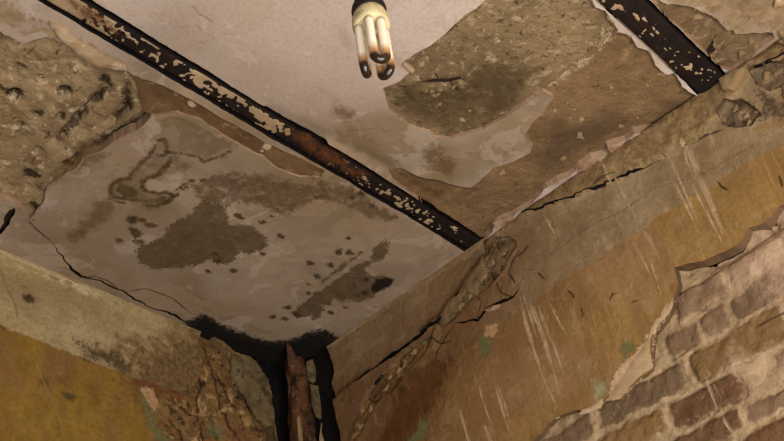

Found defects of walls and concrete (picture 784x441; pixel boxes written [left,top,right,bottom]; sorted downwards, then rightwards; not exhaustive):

crack [706,35,716,56]
leakage [78,138,228,234]
corrosion [285,129,365,177]
flaking render [0,0,784,274]
crack [574,170,639,198]
crack [0,208,49,240]
leakage [126,215,157,246]
peeling [0,250,114,300]
peeling [271,237,393,320]
crack [486,240,527,302]
flaking render [540,210,784,441]
flaking render [140,337,269,441]